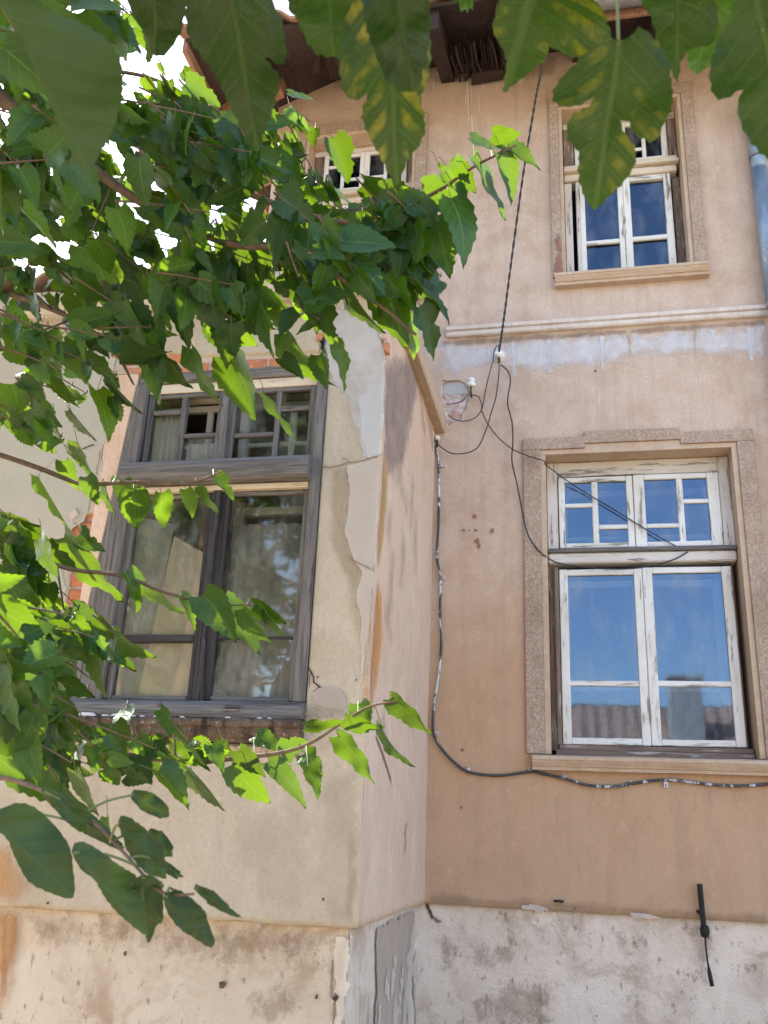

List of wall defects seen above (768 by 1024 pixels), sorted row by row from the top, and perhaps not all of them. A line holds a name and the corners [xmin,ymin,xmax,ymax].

spalling [304,333,338,358]
spalling [380,337,390,356]
spalling [167,353,190,372]
spalling [201,357,213,371]
spalling [245,355,280,368]
spalling [442,379,470,425]
damp [385,363,417,470]
peeling [344,458,379,681]
peeling [378,909,419,1024]